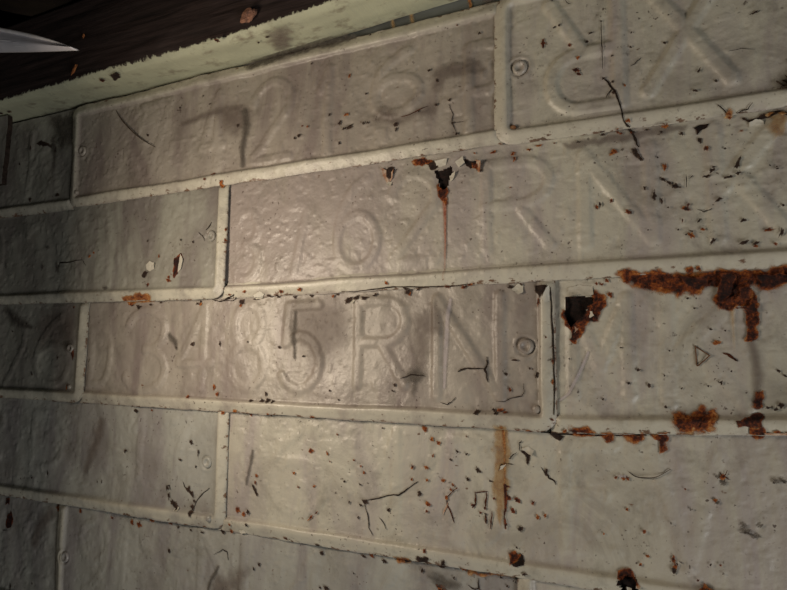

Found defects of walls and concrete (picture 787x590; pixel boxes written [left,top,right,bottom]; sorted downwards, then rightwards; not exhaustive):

peeling [381,167,394,186]
rust [437,184,448,259]
rust [561,265,787,344]
rust [672,405,719,435]
rust [736,391,787,440]
rust [471,426,669,530]
rust [617,568,639,586]